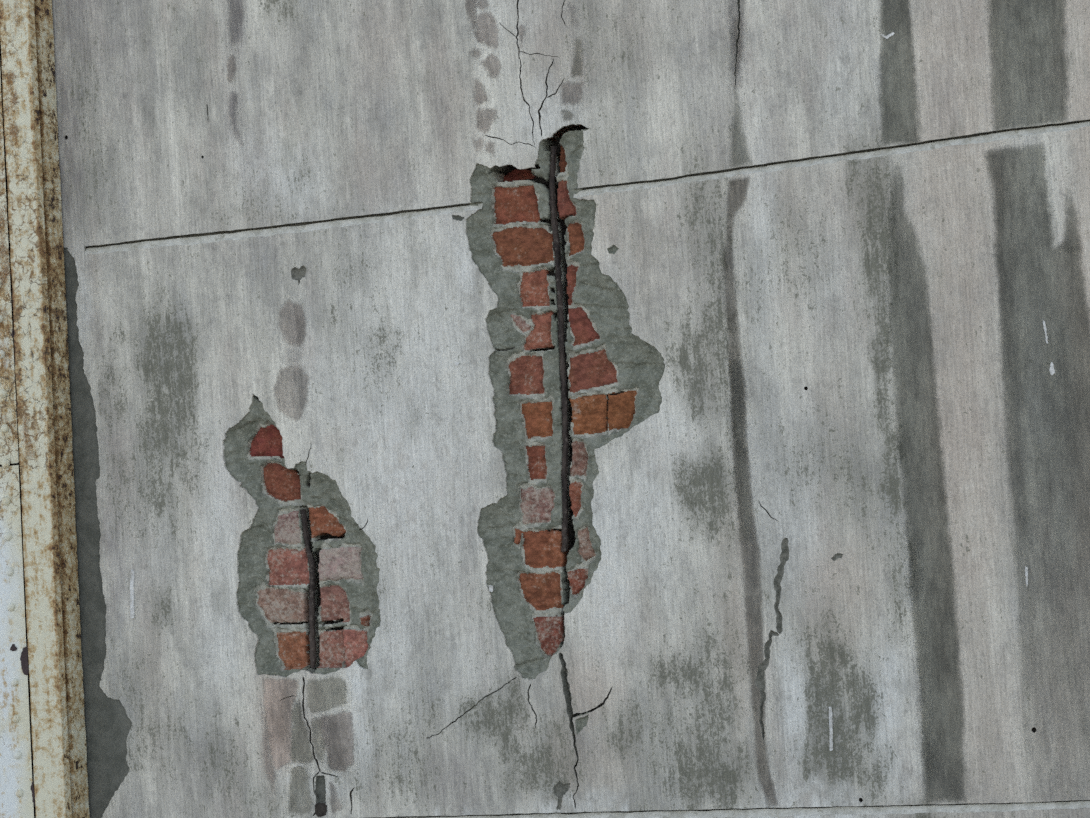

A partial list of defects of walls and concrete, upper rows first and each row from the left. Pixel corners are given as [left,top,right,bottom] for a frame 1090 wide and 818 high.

corrosion [0,73,17,142]
crack [485,0,565,147]
damp [880,0,919,144]
damp [990,0,1066,129]
peeling [63,248,132,818]
spalling [224,395,381,677]
crack [280,677,354,816]
spalling [452,124,665,680]
crack [559,653,613,809]
crack [755,502,789,740]
damp [891,177,964,801]
damp [987,145,1090,502]